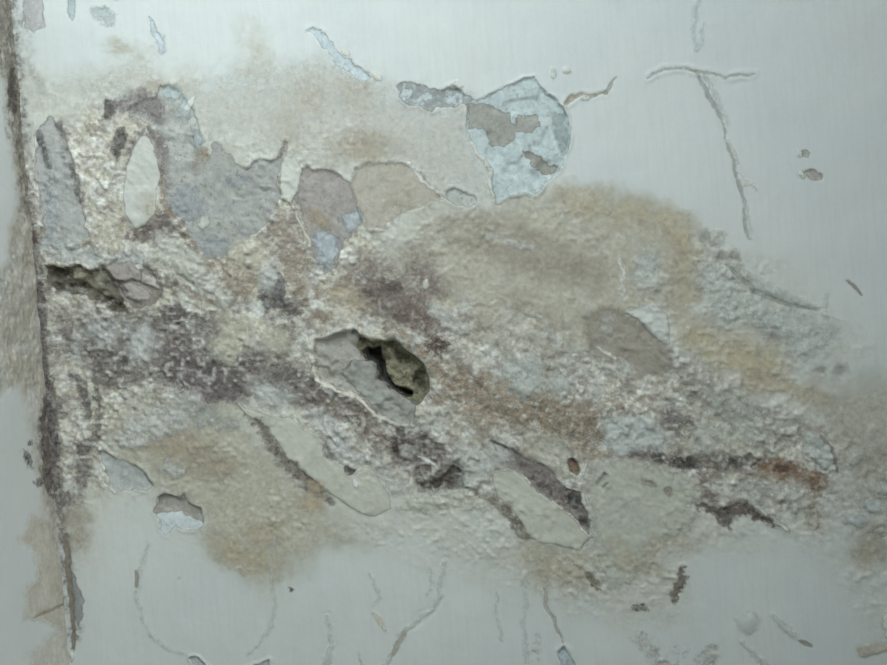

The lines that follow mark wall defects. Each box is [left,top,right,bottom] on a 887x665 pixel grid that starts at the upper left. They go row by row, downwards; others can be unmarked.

spalling [34,116,162,312]
spalling [123,84,477,274]
peeling [397,76,571,201]
crack [653,2,756,236]
water stain [0,0,570,665]
peeling [237,403,391,516]
hole [307,322,430,426]
water stain [354,189,830,403]
spalling [584,303,672,375]
water stain [602,363,795,494]
crack [39,510,85,661]
water stain [670,567,689,603]